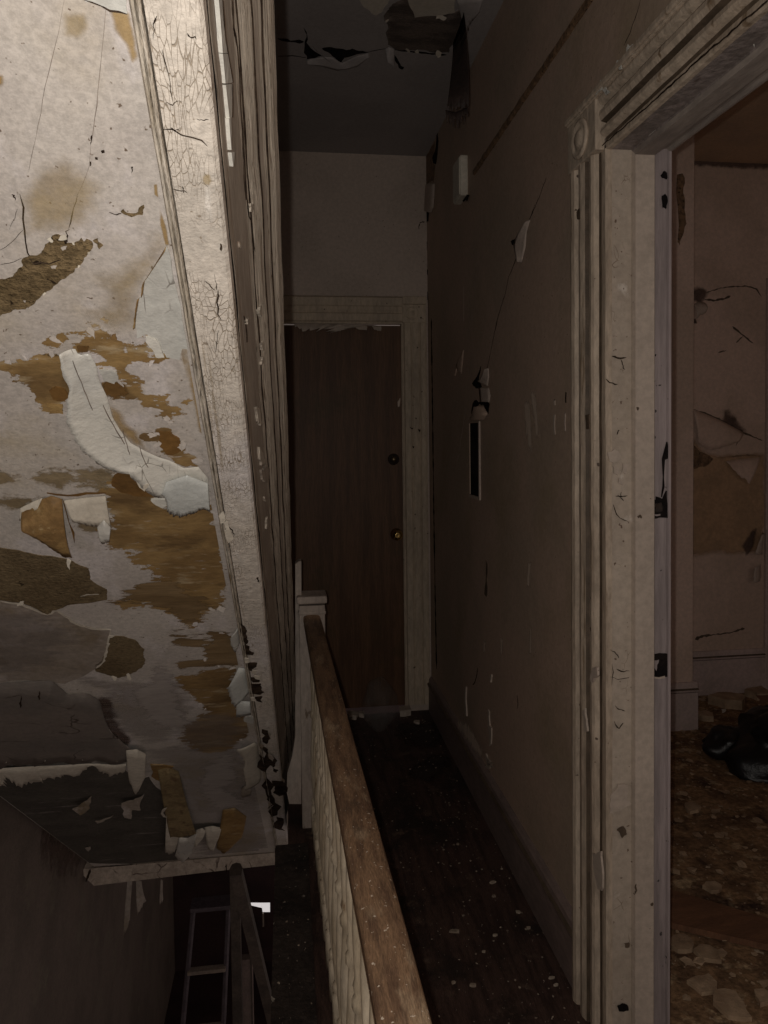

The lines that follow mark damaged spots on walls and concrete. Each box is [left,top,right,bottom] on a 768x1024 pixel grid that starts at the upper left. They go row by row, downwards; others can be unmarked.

flaking render [408,0,483,34]
crack [153,16,209,146]
crack [231,0,256,258]
crack [205,275,248,349]
crack [705,285,761,302]
crack [718,326,753,353]
peeling [0,234,288,831]
flaking render [0,763,190,864]